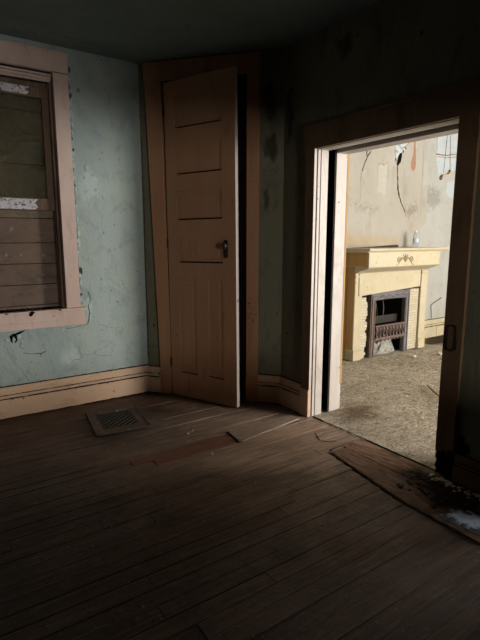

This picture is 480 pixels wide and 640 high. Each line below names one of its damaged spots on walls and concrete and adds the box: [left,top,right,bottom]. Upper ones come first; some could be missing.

crack [393,165,422,215]
flaking render [6,330,25,349]
water stain [402,469,480,531]